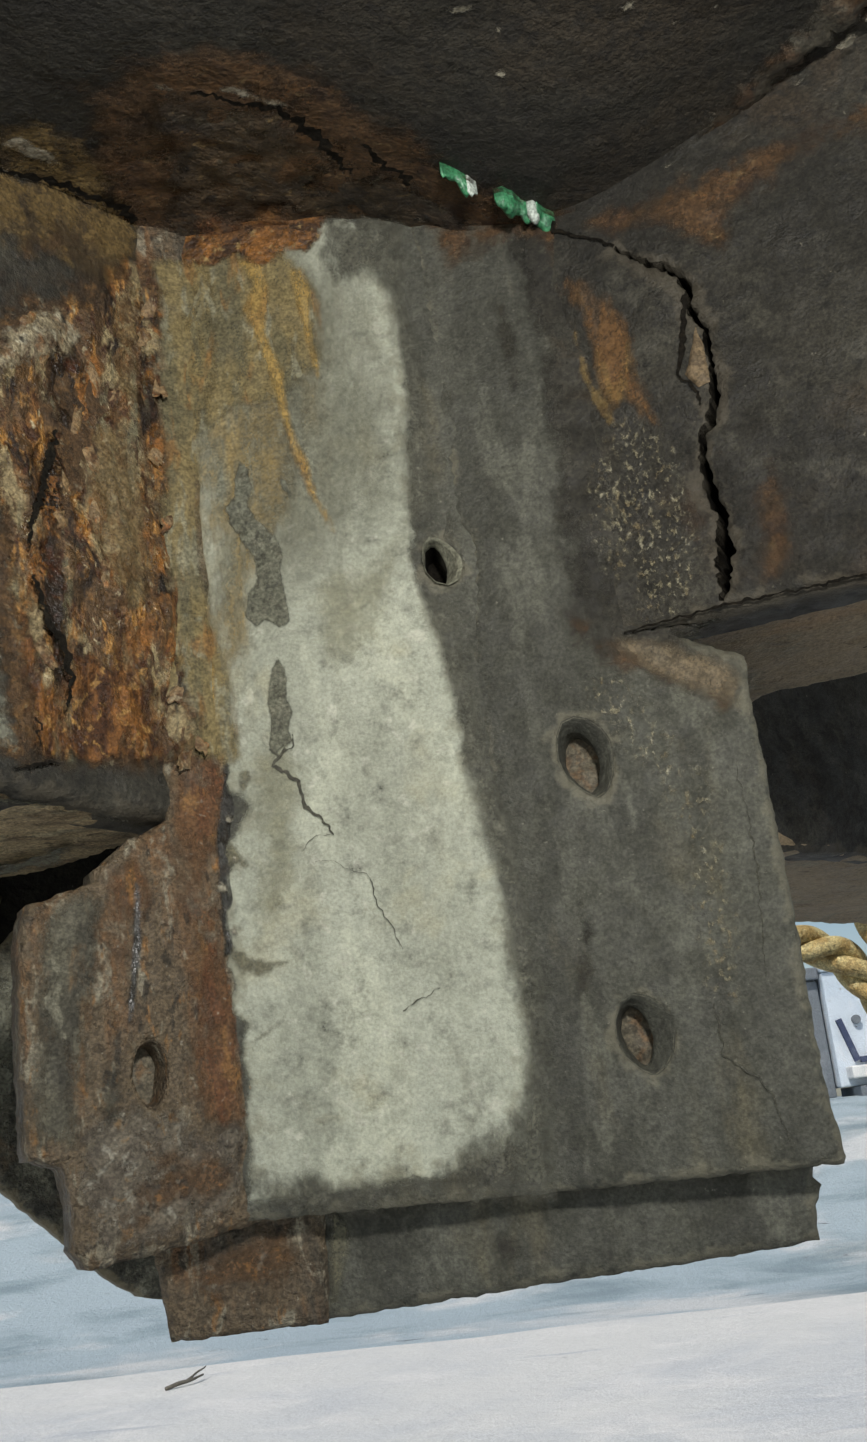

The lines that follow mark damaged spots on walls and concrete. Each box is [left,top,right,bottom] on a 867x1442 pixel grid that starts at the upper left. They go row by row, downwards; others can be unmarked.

crack [0,168,138,224]
corrosion [0,46,570,1122]
corrosion [569,281,651,420]
crack [550,220,867,634]